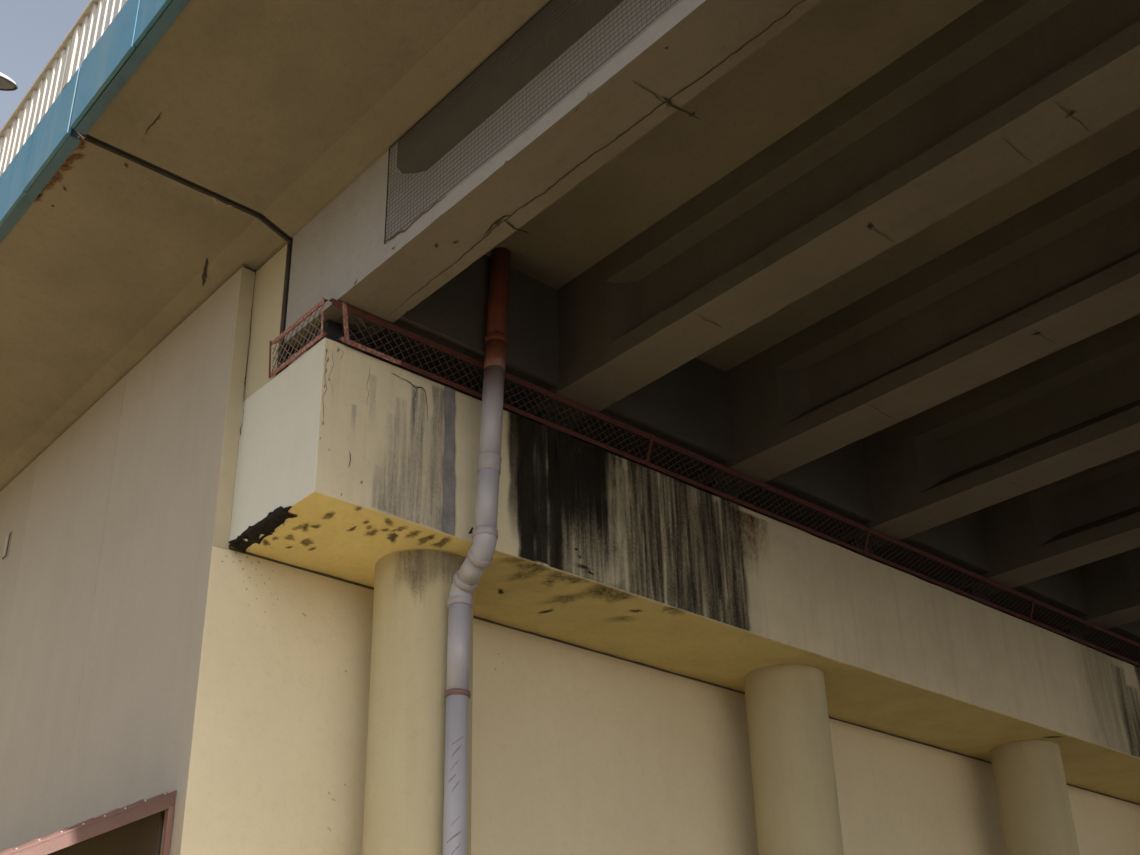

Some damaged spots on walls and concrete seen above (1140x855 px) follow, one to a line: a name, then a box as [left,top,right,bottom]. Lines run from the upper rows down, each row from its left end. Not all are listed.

crack [388,0,805,317]
spalling [221,506,333,612]
peeling [348,507,449,547]
water stain [434,386,456,535]
water stain [509,413,749,631]